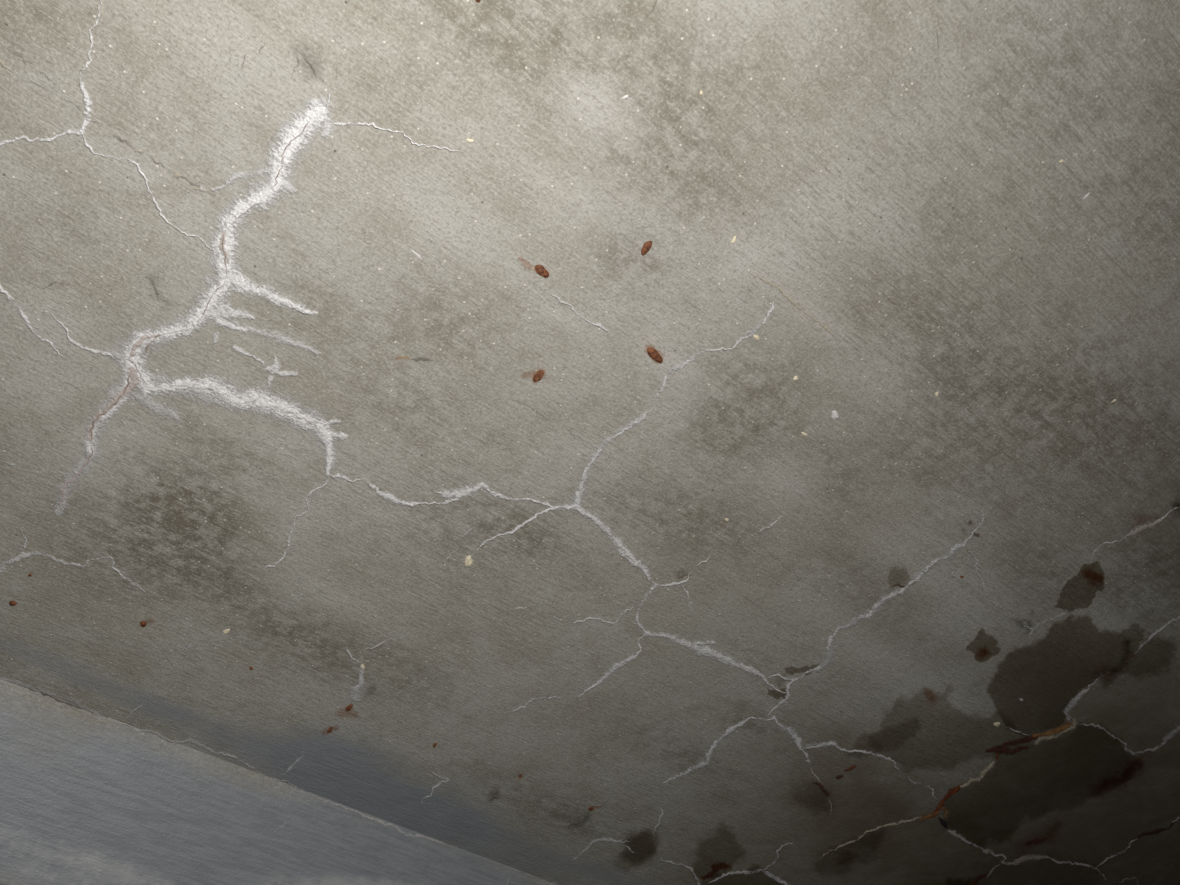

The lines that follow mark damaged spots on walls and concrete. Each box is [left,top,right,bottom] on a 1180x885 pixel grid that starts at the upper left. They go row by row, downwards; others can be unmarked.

rust [641,241,652,256]
rust [535,265,549,278]
rust [647,348,663,363]
crack [0,3,1006,783]
crack [1092,507,1180,557]
crack [1134,617,1180,654]
crack [422,772,449,809]
crack [820,679,1180,885]
crack [573,838,634,860]
crack [660,843,792,885]